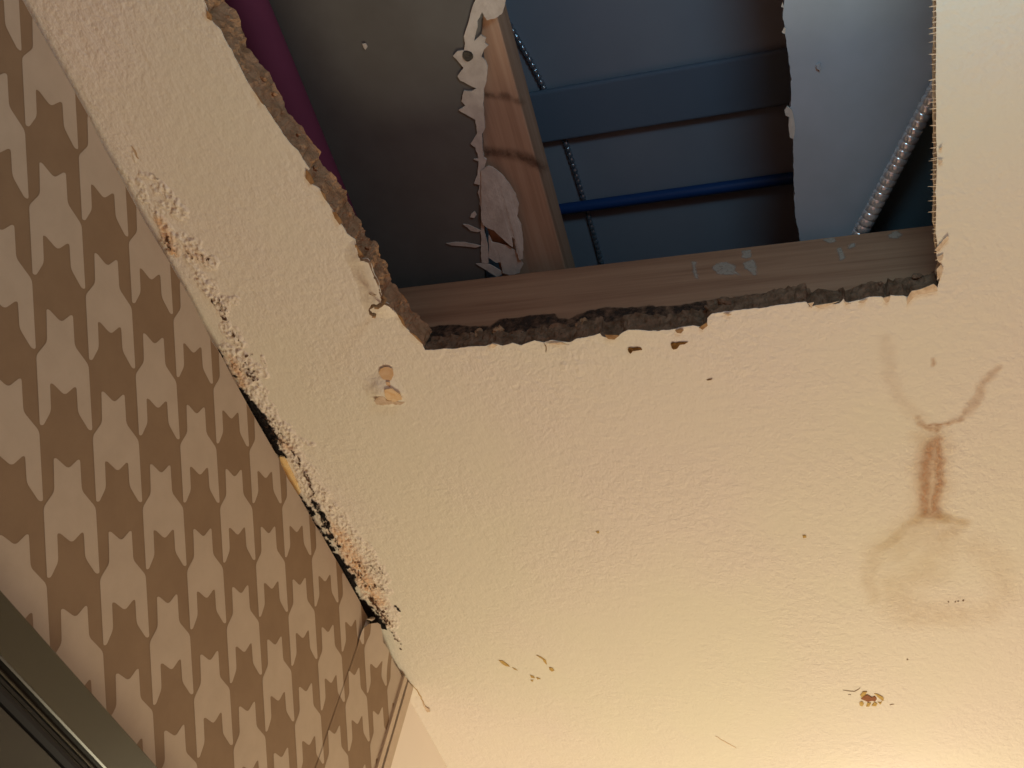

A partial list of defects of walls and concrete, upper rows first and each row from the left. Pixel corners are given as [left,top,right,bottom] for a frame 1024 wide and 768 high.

spalling [204,0,941,350]